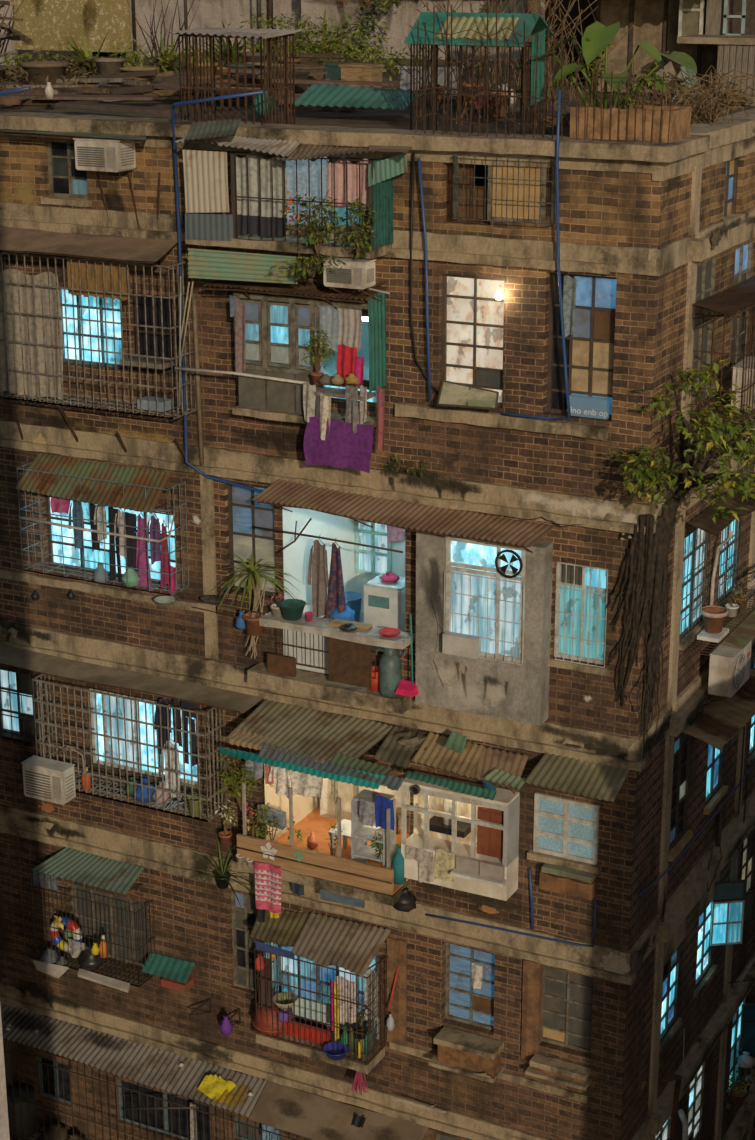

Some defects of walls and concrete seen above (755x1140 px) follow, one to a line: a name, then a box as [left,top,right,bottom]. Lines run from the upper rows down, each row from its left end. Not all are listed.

damp [425,560,442,619]
damp [435,666,508,709]